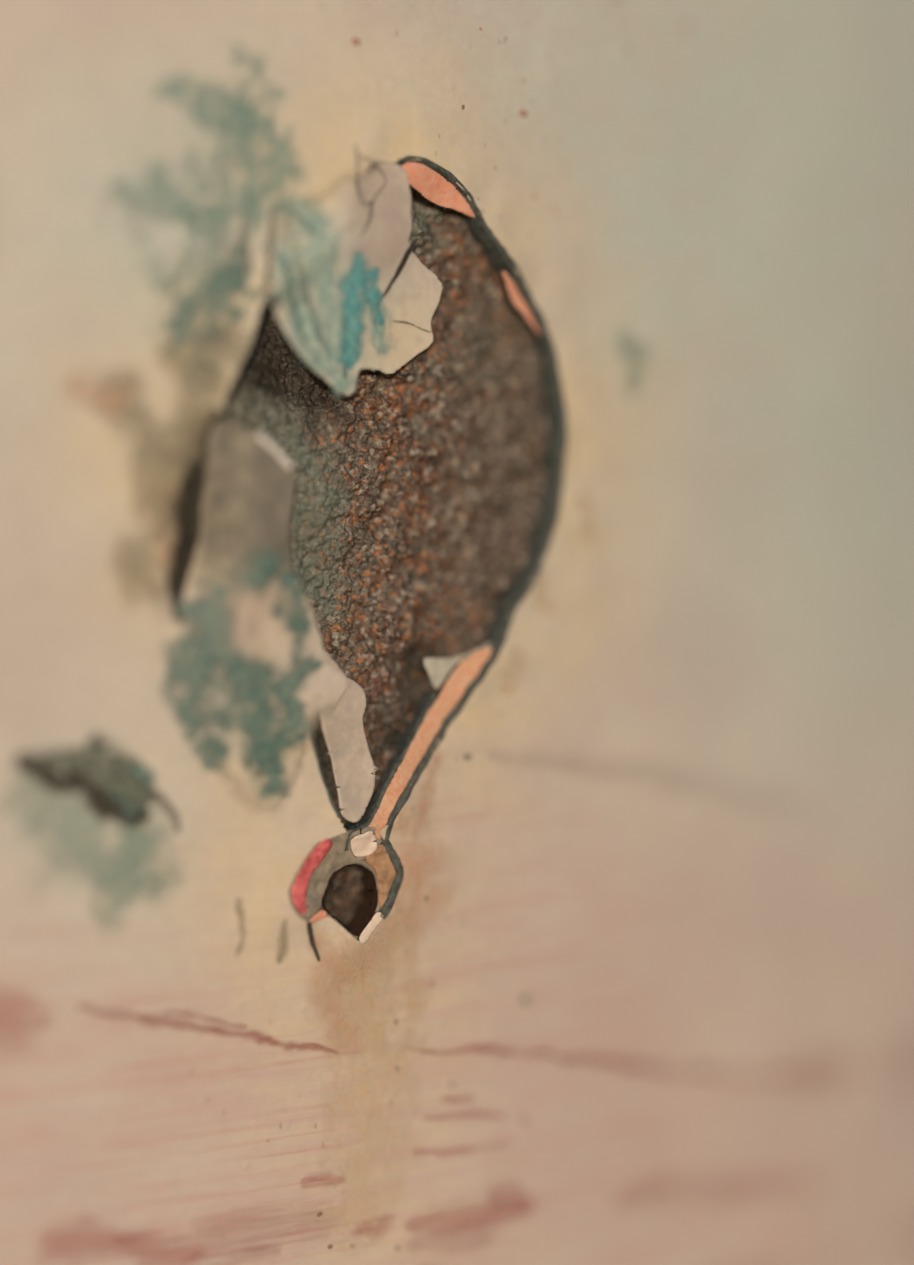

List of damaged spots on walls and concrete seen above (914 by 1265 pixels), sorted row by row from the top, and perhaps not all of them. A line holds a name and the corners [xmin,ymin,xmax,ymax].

water stain [116,80,298,528]
water stain [275,197,385,394]
water stain [164,550,321,796]
peeling [221,155,567,944]